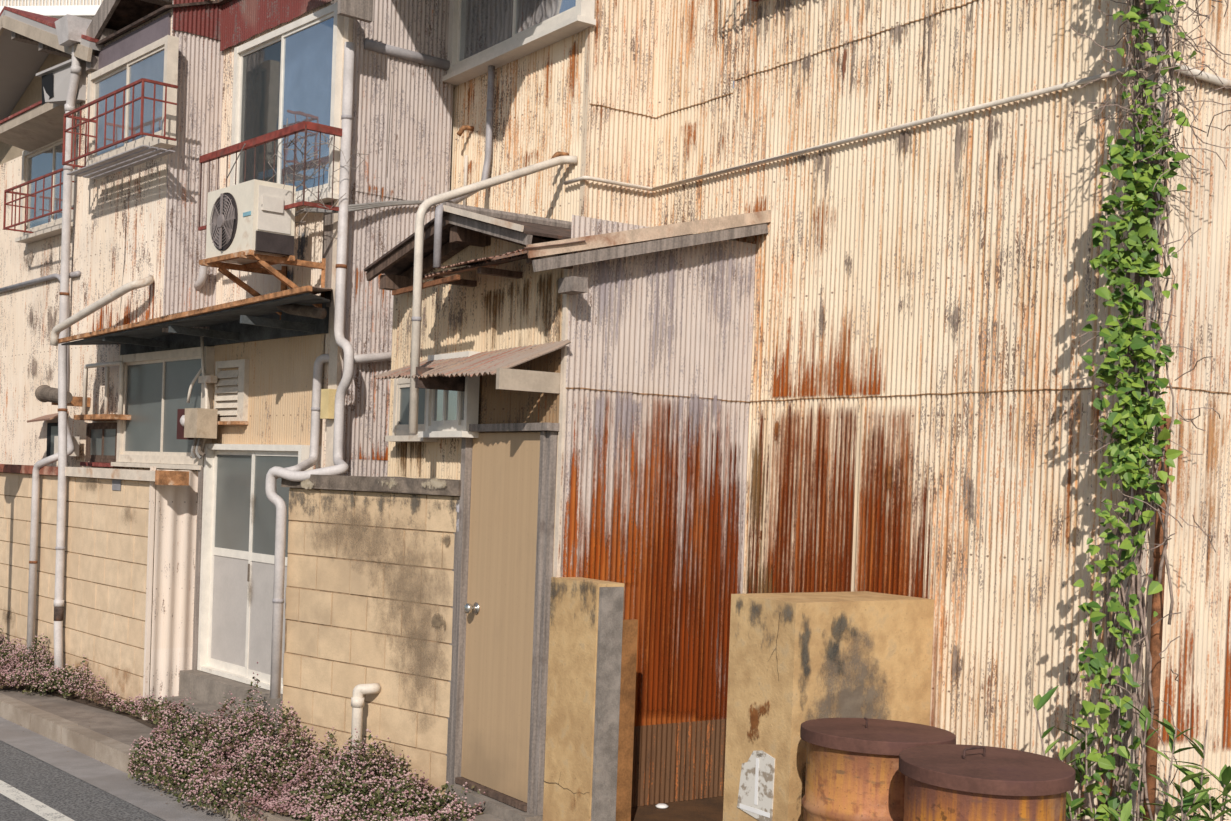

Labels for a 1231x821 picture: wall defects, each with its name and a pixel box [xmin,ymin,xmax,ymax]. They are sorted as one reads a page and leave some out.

water stain [289,491,420,542]
rust [559,312,934,726]
rust [1176,400,1229,578]
water stain [550,582,596,622]
water stain [784,606,810,691]
water stain [808,614,886,720]
rust [1158,583,1231,749]
rust [747,701,770,740]